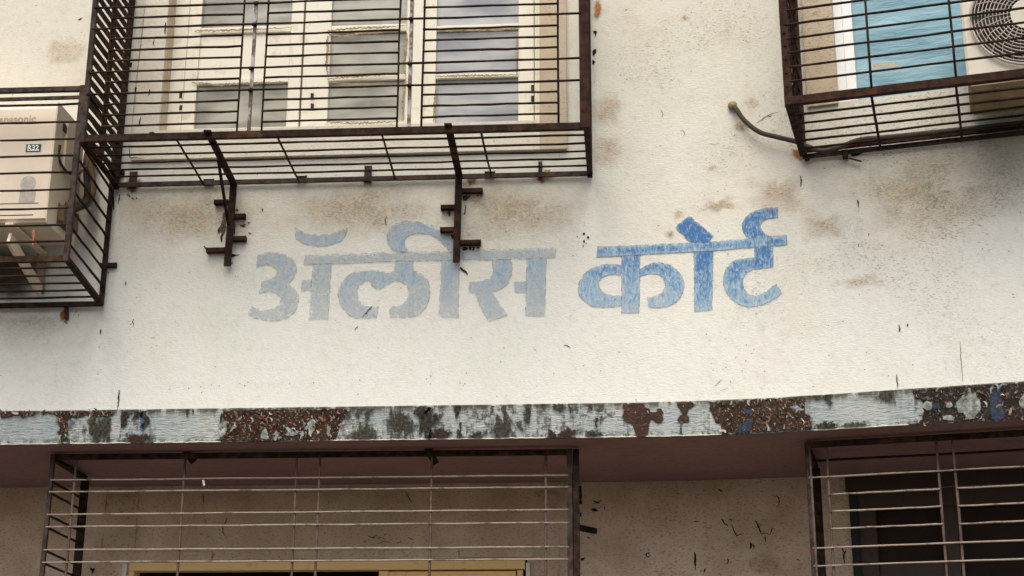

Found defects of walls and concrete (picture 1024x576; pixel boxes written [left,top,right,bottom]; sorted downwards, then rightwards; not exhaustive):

peeling [0,408,117,443]
peeling [218,407,349,442]
peeling [622,403,664,437]
peeling [709,397,813,434]
peeling [912,383,1024,426]